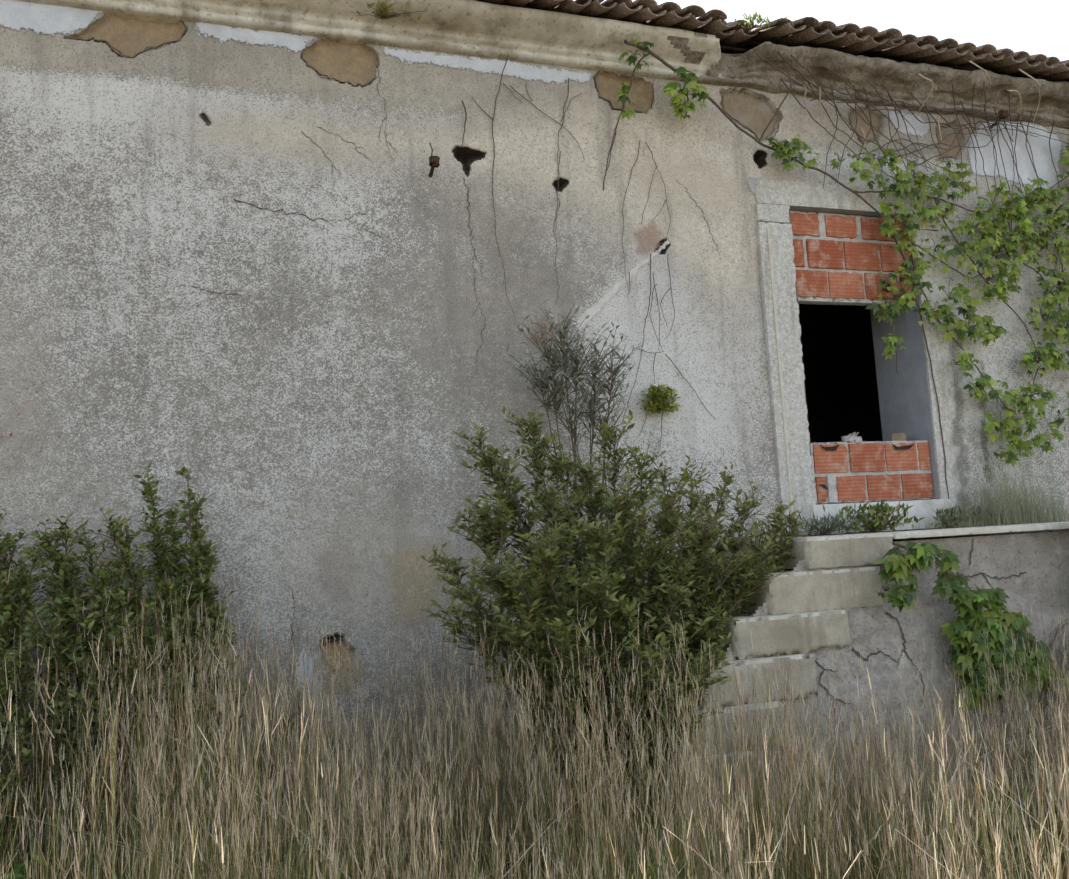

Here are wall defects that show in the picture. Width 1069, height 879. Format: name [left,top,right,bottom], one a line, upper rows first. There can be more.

spalling [0,0,654,113]
spalling [453,146,486,175]
spalling [553,178,569,190]
crack [234,199,381,237]
crack [464,179,486,376]
peeling [293,635,354,696]
crack [815,611,925,716]